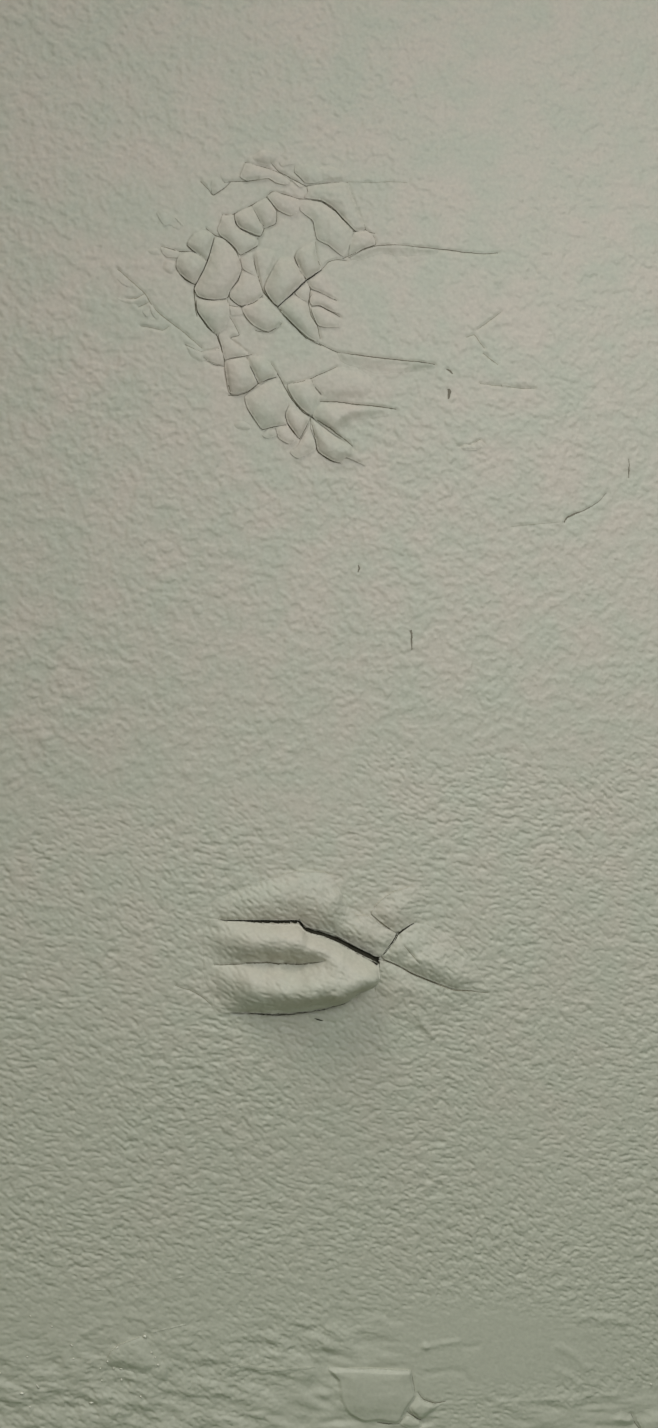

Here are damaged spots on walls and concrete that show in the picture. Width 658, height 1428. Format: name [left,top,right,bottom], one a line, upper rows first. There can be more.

crack [116,270,202,348]
flaking render [327,1367,445,1428]